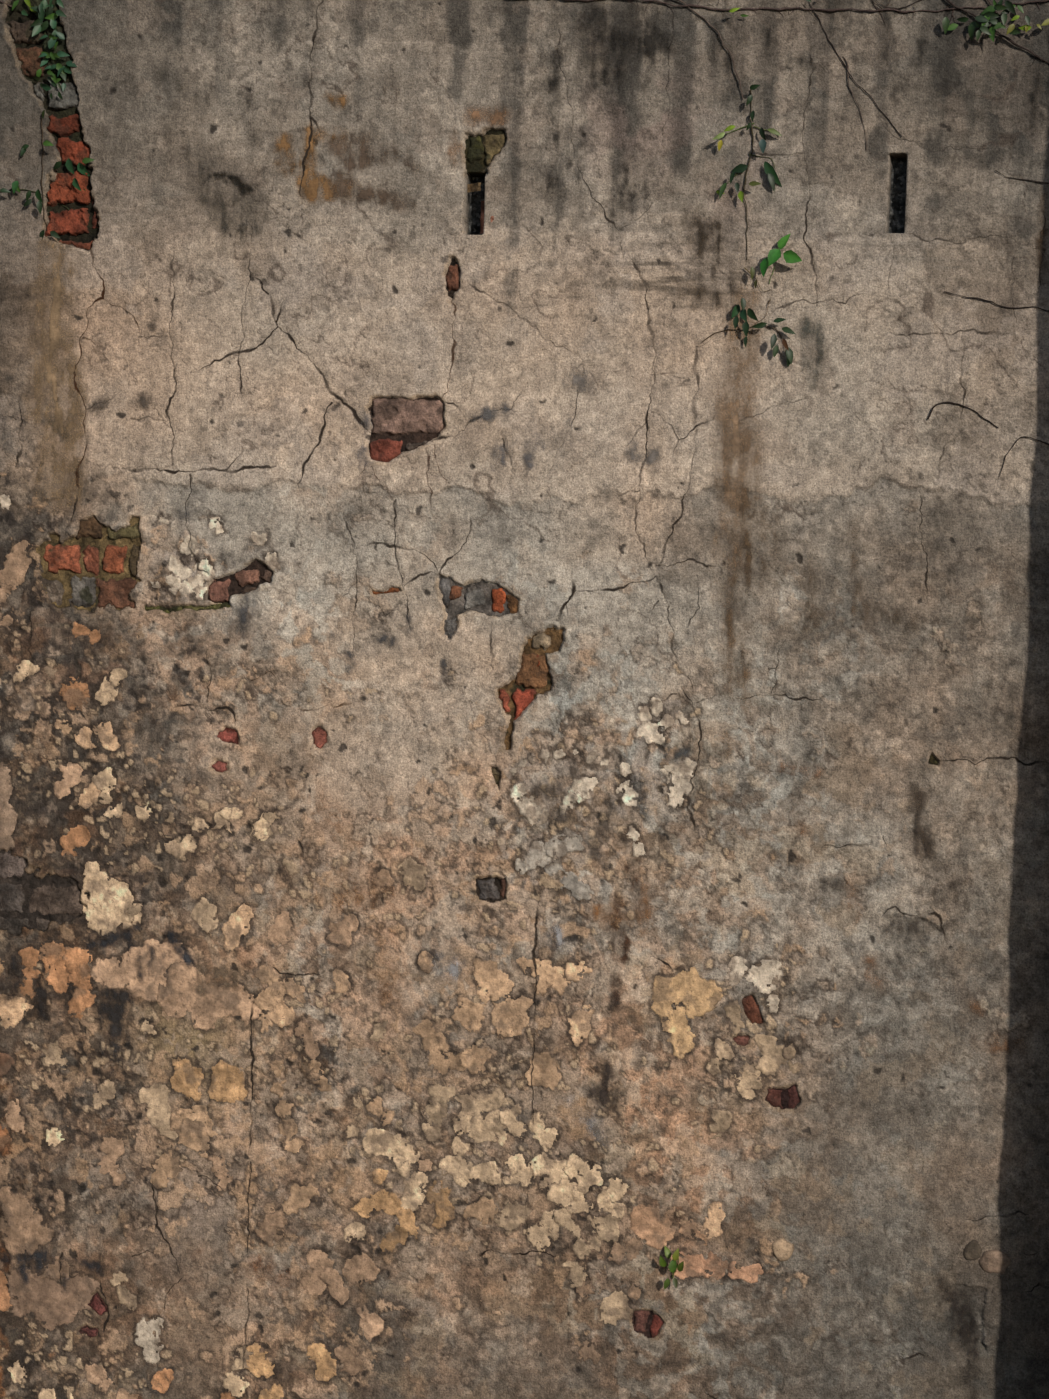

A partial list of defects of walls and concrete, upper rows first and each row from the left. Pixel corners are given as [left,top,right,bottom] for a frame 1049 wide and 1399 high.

spalling [5,0,99,251]
leakage [187,148,266,238]
leakage [330,135,415,210]
leakage [591,6,670,88]
leakage [693,218,735,305]
crack [71,250,365,573]
spalling [368,397,445,462]
crack [428,286,518,496]
spalling [0,516,281,644]
crack [345,464,472,655]
crack [560,355,709,826]
peeling [476,627,639,903]